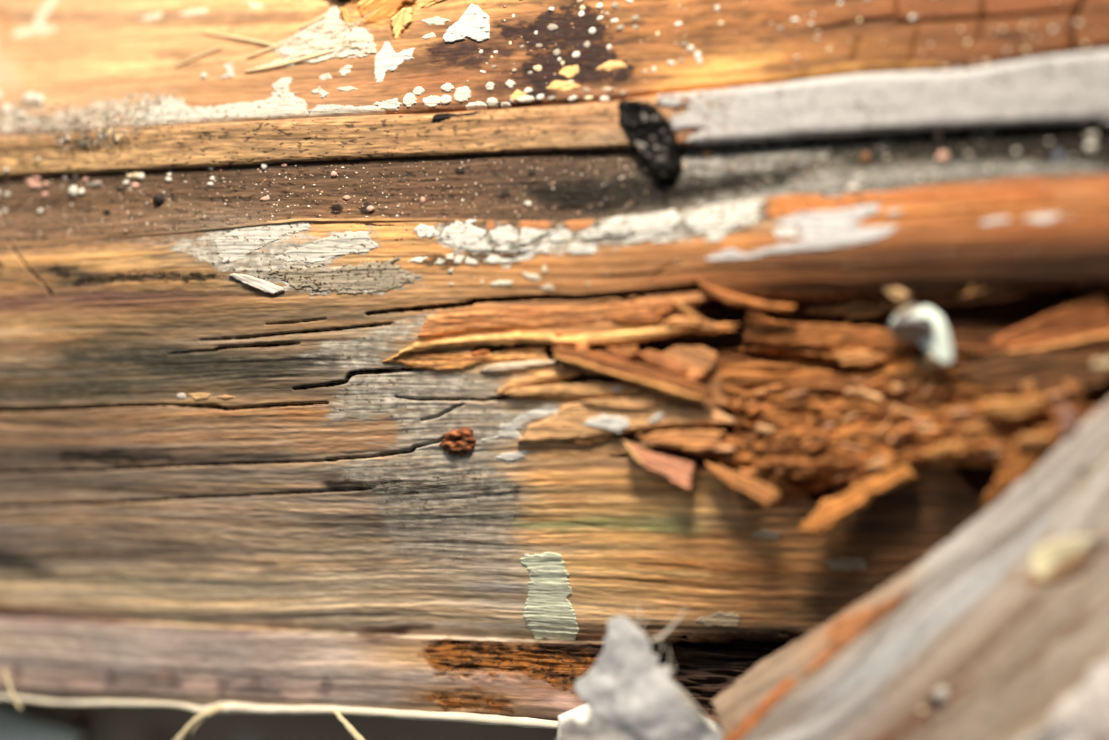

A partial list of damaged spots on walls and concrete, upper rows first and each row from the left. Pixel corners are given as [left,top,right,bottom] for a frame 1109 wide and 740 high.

peeling [132,3,581,128]
damp [428,0,636,106]
crack [832,0,1086,53]
peeling [214,221,311,264]
peeling [269,191,903,295]
peeling [978,214,1072,225]
crack [0,368,427,412]
spalling [644,282,1109,499]
crack [0,394,544,474]
peeling [481,406,559,464]
peeling [583,414,630,433]
crack [0,489,363,509]